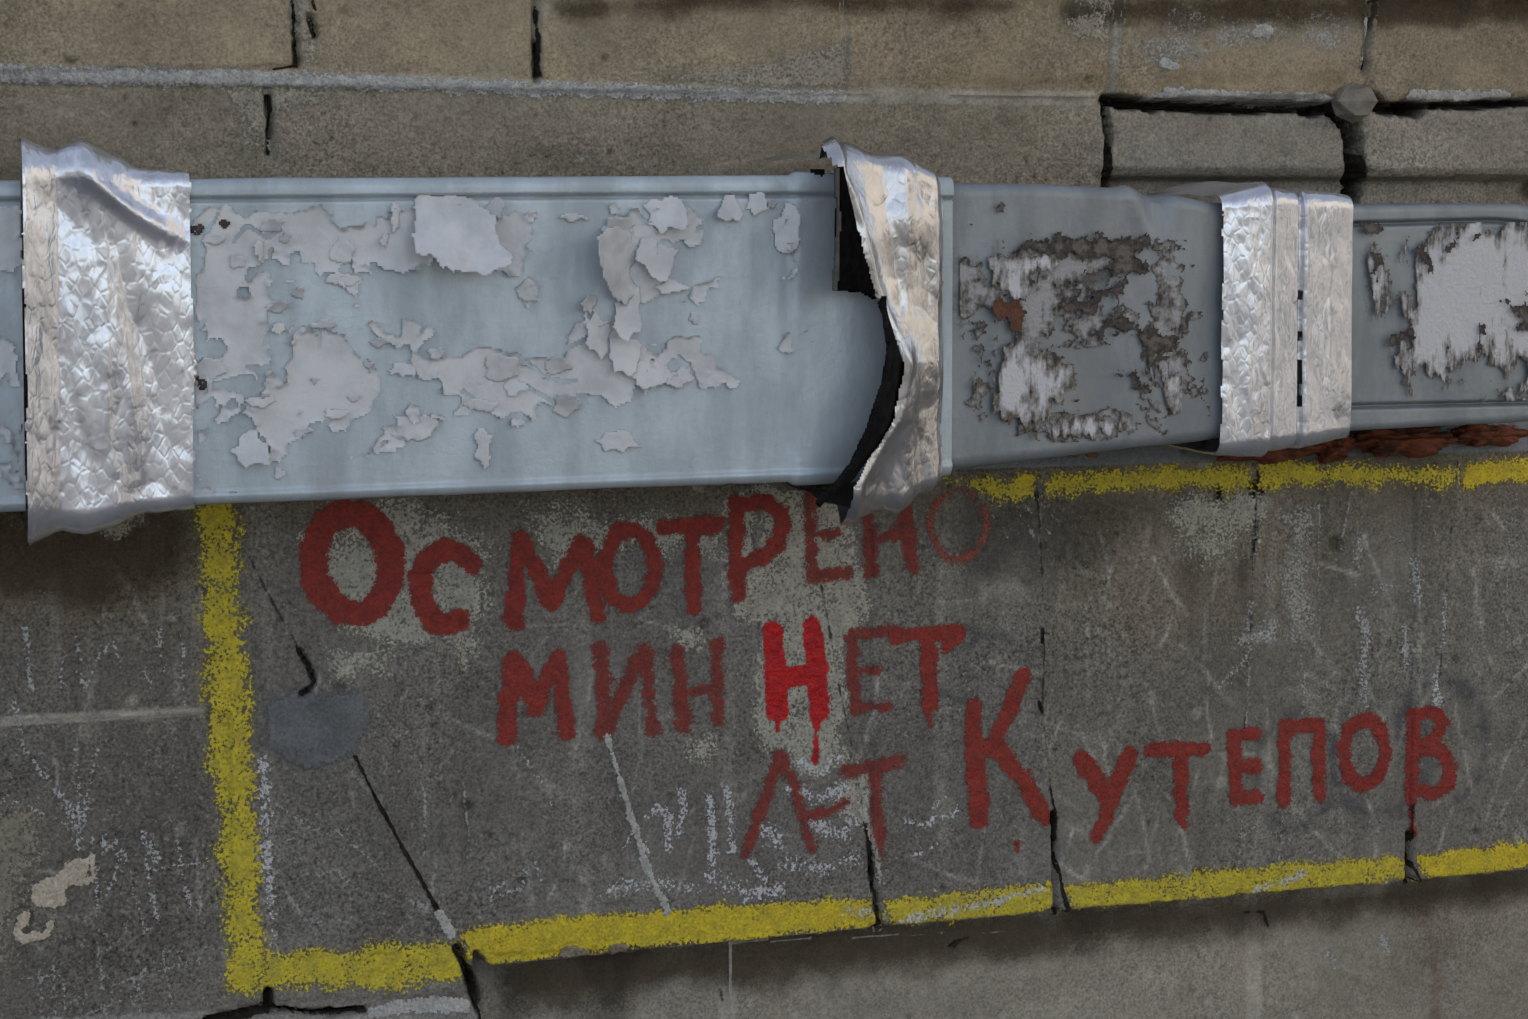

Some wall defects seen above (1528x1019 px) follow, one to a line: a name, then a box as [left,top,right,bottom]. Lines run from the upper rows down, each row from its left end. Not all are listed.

peeling [190,219,230,235]
peeling [391,195,513,276]
peeling [265,285,305,335]
peeling [559,196,695,389]
peeling [363,337,444,377]
peeling [230,430,285,479]
peeling [390,414,439,441]
crack [250,557,316,696]
crack [820,585,885,927]
crack [353,755,440,911]
crack [203,987,366,1019]
crack [453,944,481,1019]